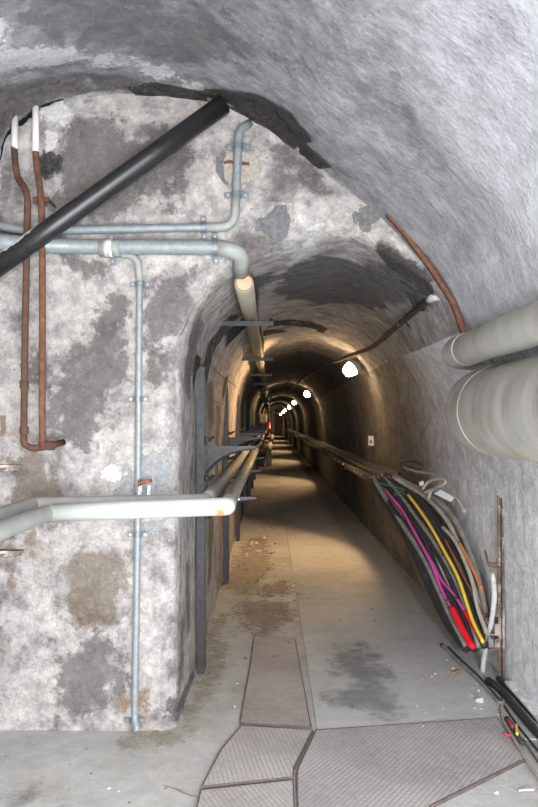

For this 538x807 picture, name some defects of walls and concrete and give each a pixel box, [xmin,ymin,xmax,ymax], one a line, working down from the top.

water stain [20,291,131,454]
water stain [53,546,132,731]
rust [115,689,151,716]